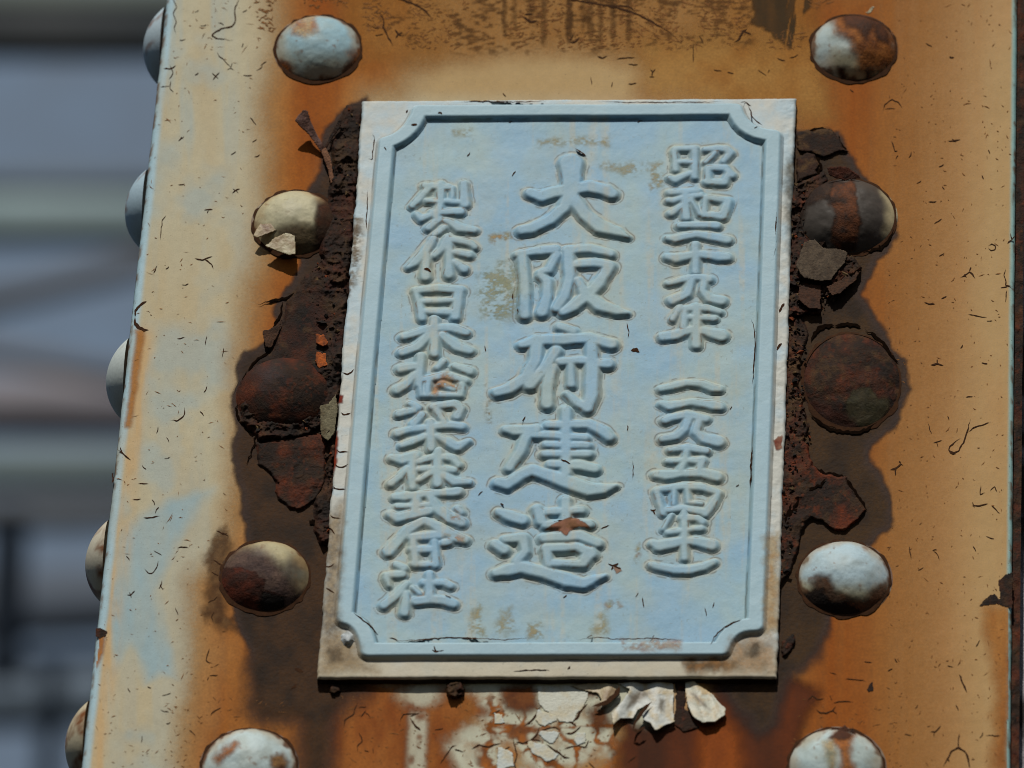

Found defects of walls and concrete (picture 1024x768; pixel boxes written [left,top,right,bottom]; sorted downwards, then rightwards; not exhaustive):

rust [179,0,935,768]
peeling [980,573,1013,608]
peeling [496,747,514,768]
peeling [527,681,726,762]